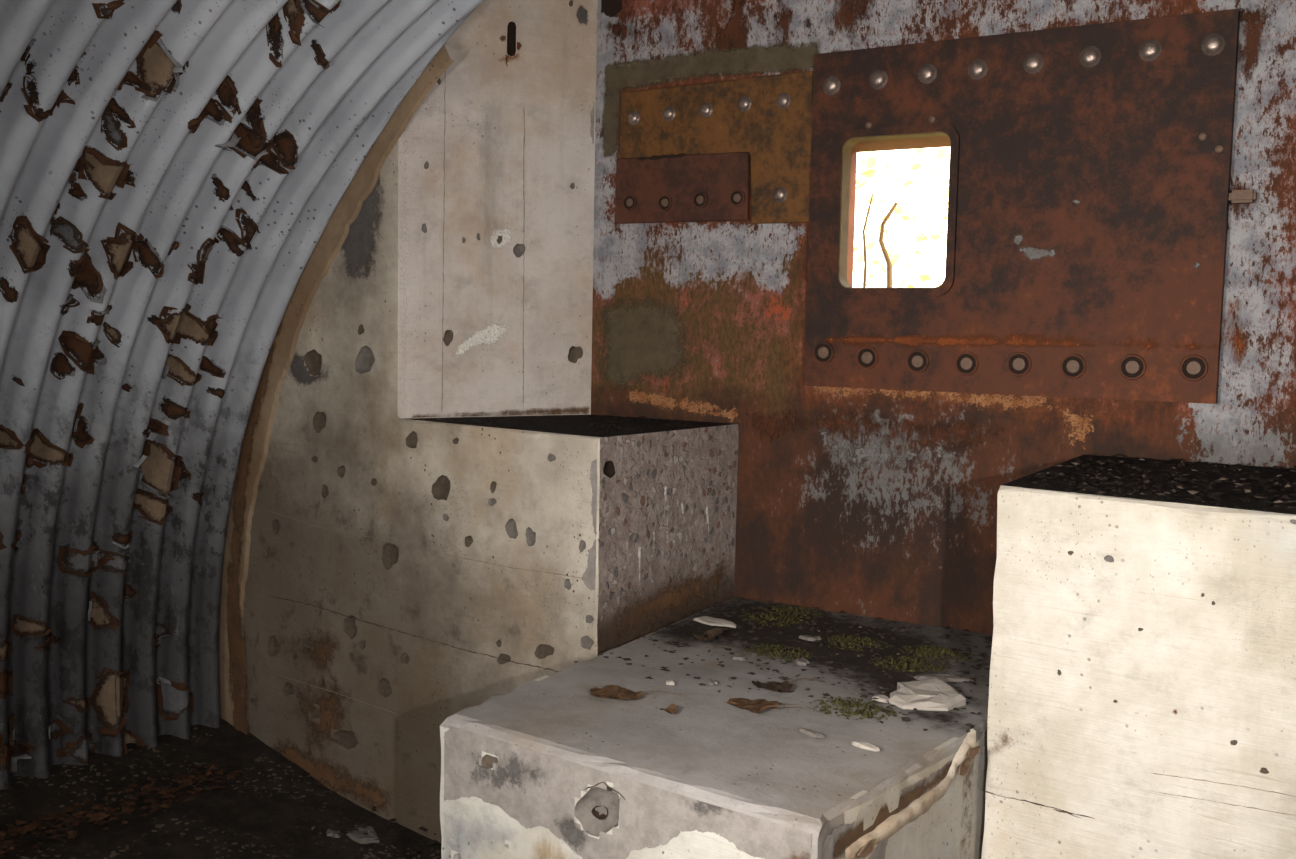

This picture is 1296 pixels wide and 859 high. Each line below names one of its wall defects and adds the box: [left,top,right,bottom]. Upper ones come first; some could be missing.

peeling [136,31,189,102]
corrosion [603,21,639,40]
corrosion [714,0,750,51]
corrosion [774,2,811,45]
corrosion [829,0,874,36]
corrosion [1238,9,1270,82]
peeling [78,106,131,200]
peeling [8,203,142,280]
peeling [154,303,218,386]
peeling [889,678,966,711]
peeling [444,724,981,859]
crack [981,789,1095,819]